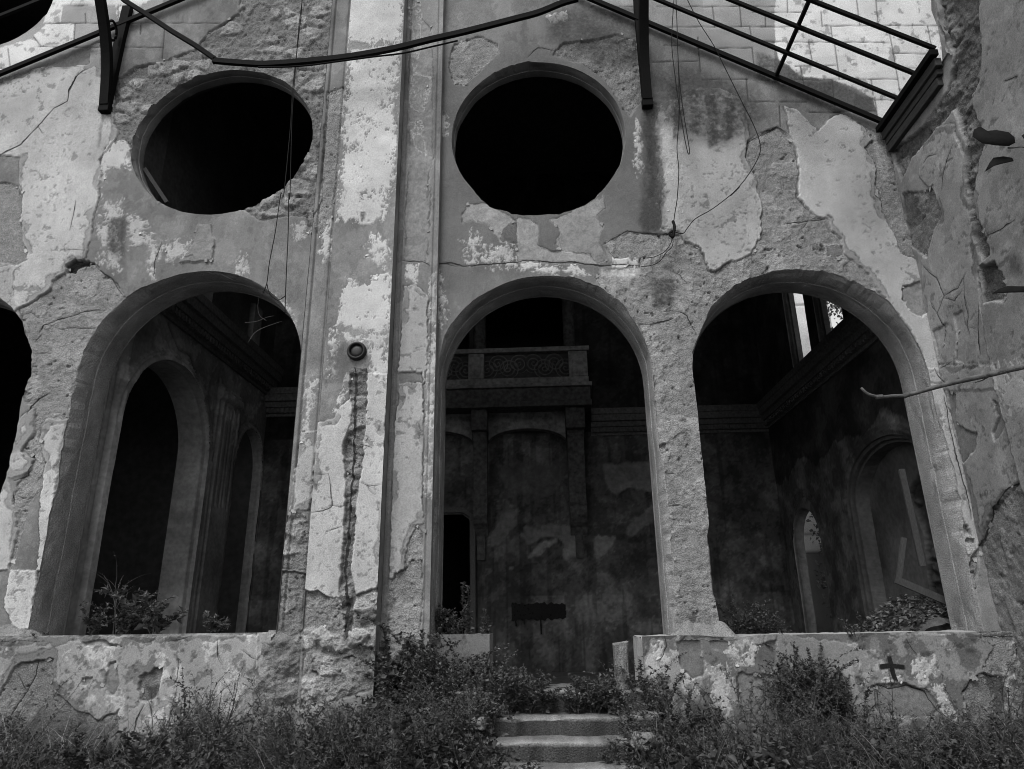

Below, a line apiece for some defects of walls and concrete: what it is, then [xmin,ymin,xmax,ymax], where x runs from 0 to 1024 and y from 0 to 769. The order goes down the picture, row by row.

crack [0,69,86,155]
spalling [854,0,1007,302]
spalling [0,183,28,265]
spalling [9,0,451,570]
crack [408,230,668,268]
crack [311,368,377,632]
spalling [457,125,880,730]
crack [944,396,1020,546]
spalling [0,657,120,764]
spalling [83,639,122,647]
spalling [139,665,163,701]